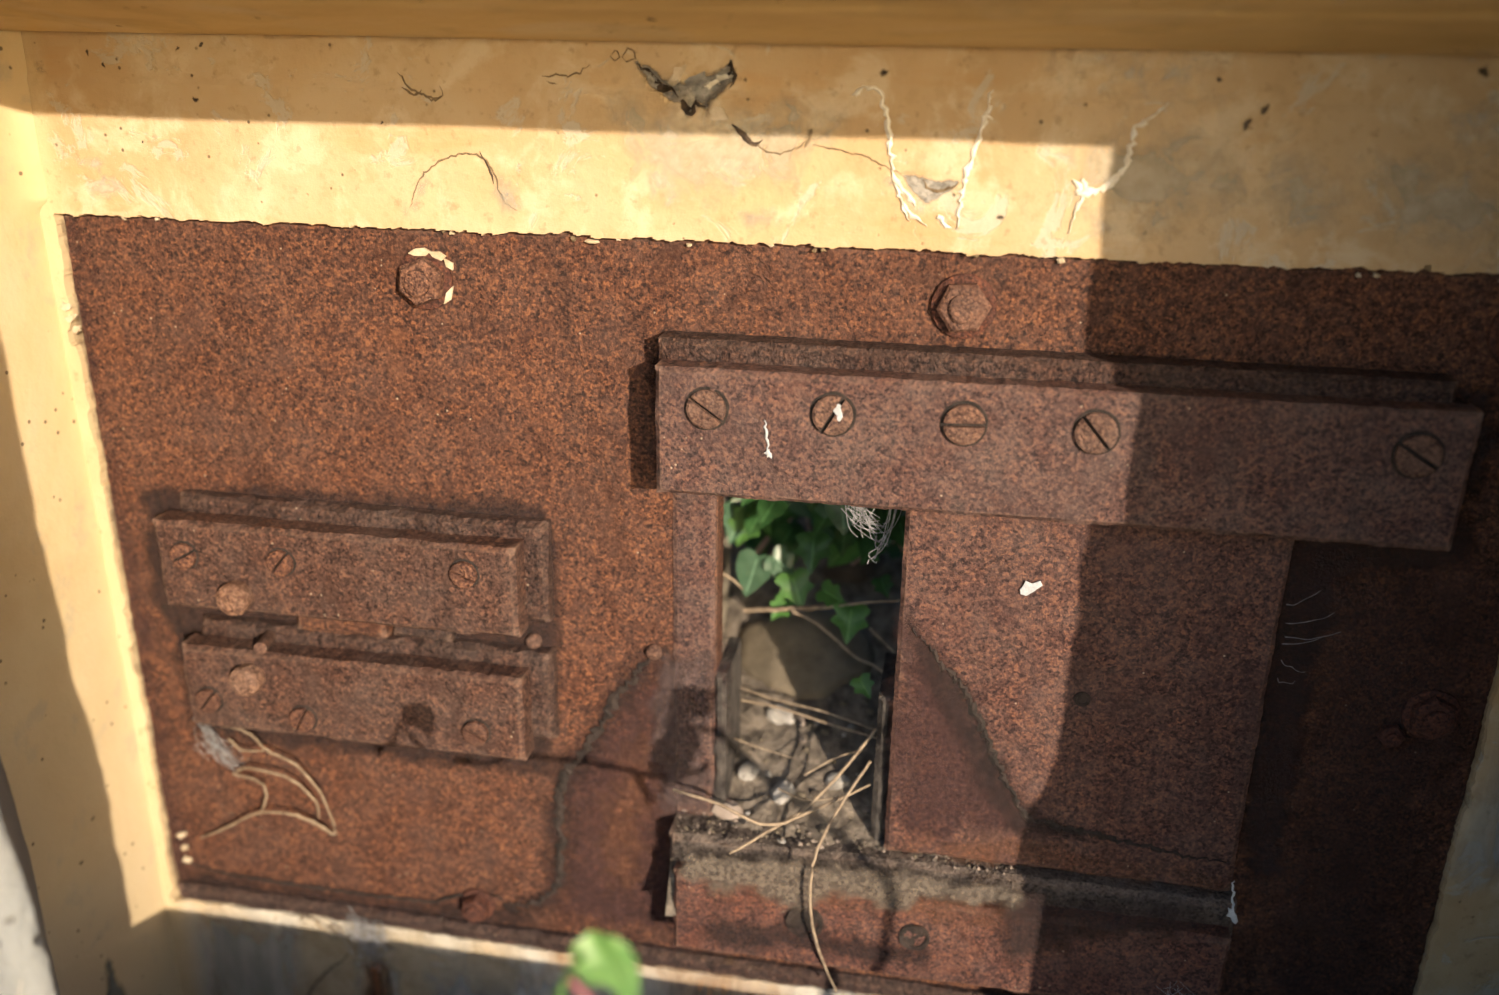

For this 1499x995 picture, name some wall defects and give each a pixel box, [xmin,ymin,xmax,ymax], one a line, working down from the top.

crack [410,152,516,210]
peeling [627,60,800,200]
crack [732,124,902,175]
spalling [904,175,959,203]
rust [1454,391,1499,499]
rust [124,490,297,695]
rust [377,496,558,648]
rust [1243,517,1475,876]
rust [170,656,712,937]
rust [677,977,751,995]
rust [710,924,927,964]
rust [1006,896,1222,957]